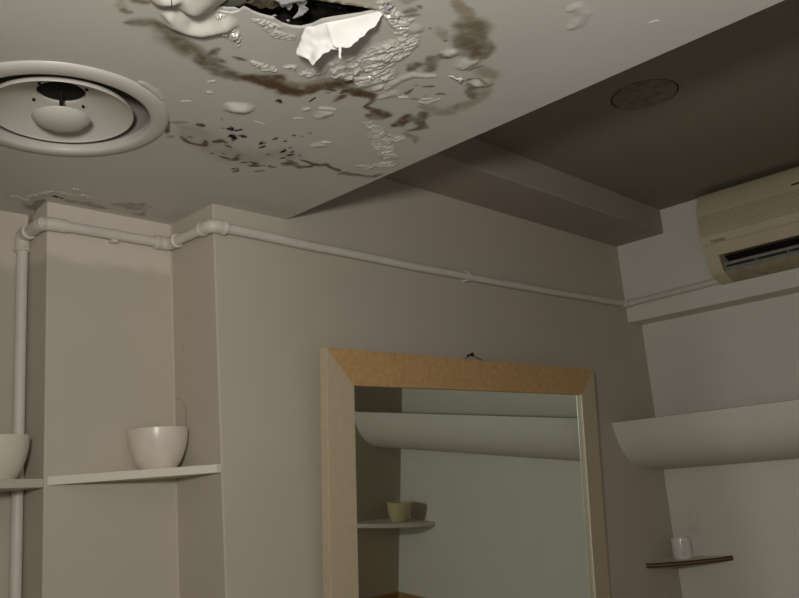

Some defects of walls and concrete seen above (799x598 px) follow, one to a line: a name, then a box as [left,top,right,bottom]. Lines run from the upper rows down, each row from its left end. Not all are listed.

peeling [296,0,393,65]
damp [445,4,494,59]
damp [198,50,427,131]
damp [181,118,361,175]